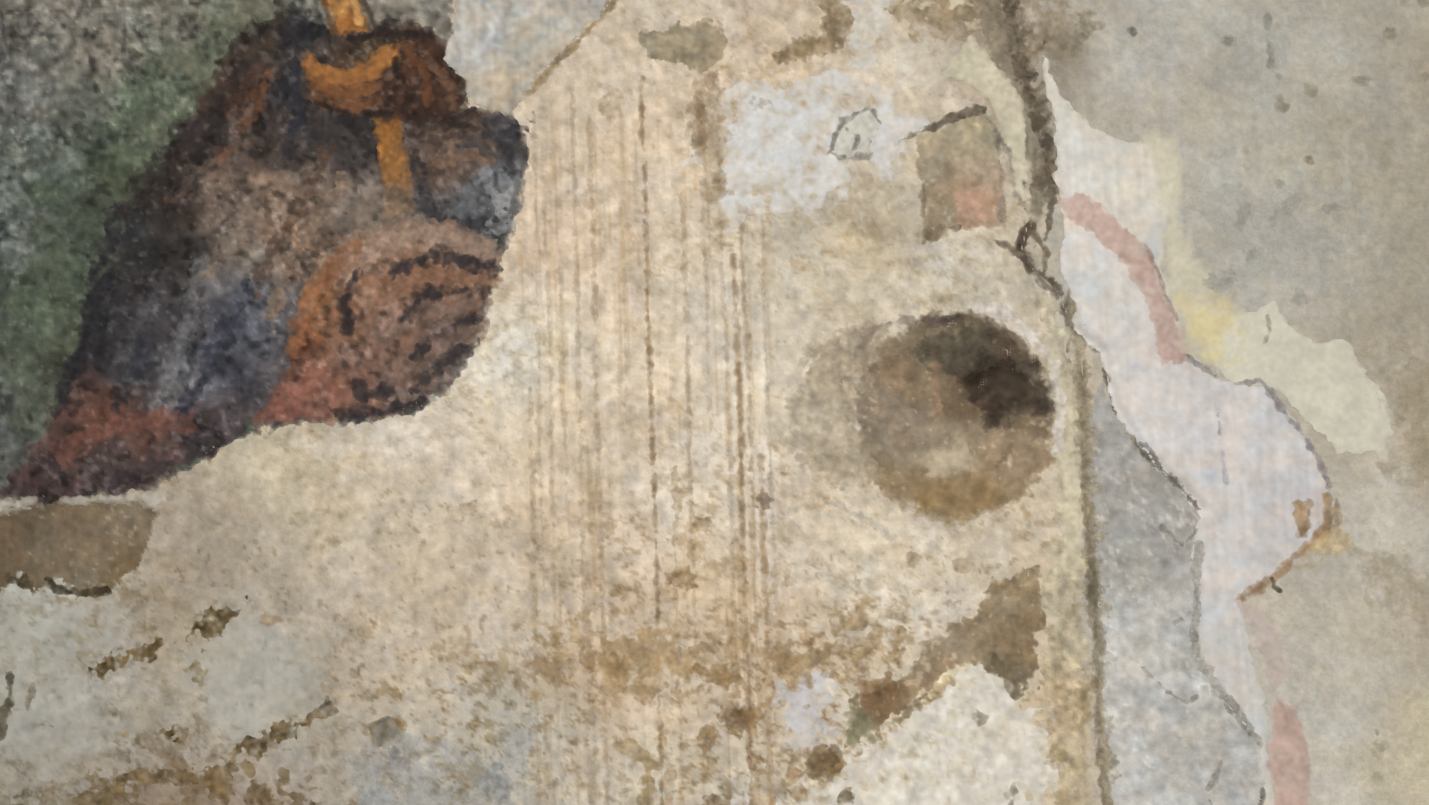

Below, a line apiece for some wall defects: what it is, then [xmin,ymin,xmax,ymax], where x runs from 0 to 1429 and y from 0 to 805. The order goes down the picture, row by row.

spalling [898,103,1021,245]
crack [989,0,1178,487]
damp [342,0,964,805]
spalling [0,488,168,600]
damp [941,557,975,574]
damp [88,595,248,689]
damp [0,695,339,805]